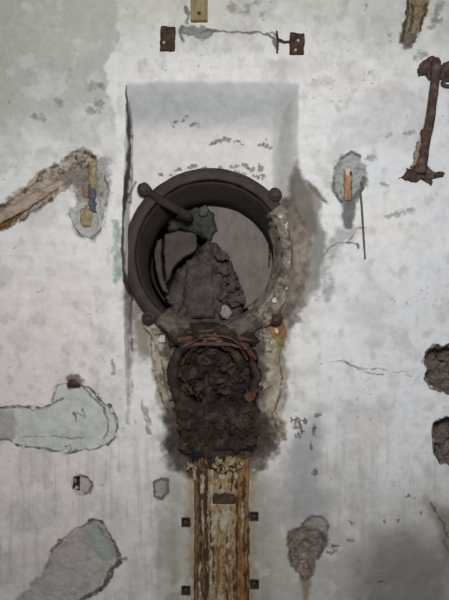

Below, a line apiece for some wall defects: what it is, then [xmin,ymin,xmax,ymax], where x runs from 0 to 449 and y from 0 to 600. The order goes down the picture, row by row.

crack [202,29,277,49]
spalling [69,158,110,240]
spalling [332,150,368,204]
damp [248,169,326,329]
rust [270,321,286,355]
spalling [424,343,449,395]
peeling [0,383,118,455]
spalling [432,416,449,465]
spalling [72,474,93,495]
spalling [153,478,169,500]
peeling [18,519,122,600]
rust [189,465,250,600]